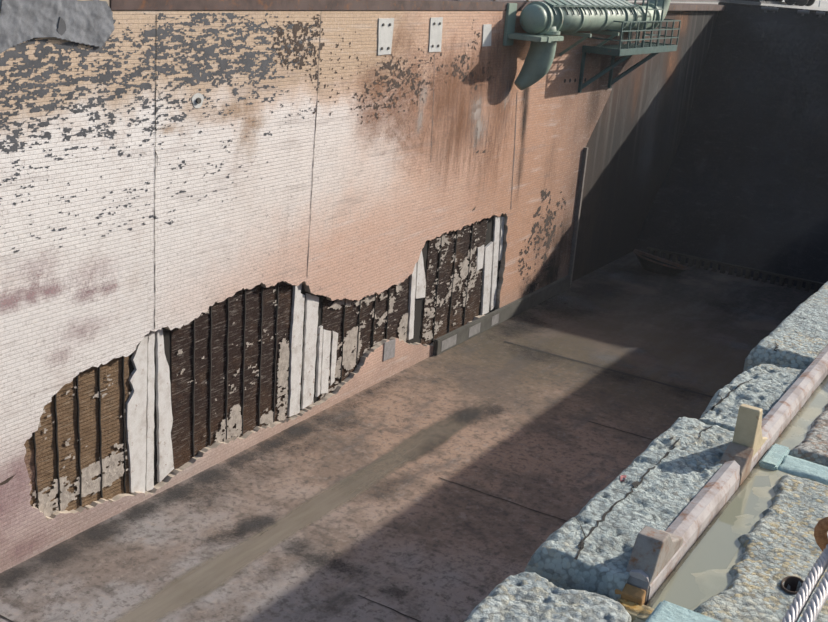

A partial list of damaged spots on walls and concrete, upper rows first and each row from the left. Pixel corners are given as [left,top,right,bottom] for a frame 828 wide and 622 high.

peeling [0,13,494,205]
peeling [96,182,150,237]
peeling [518,189,566,283]
spalling [24,213,508,521]
crack [439,341,752,560]